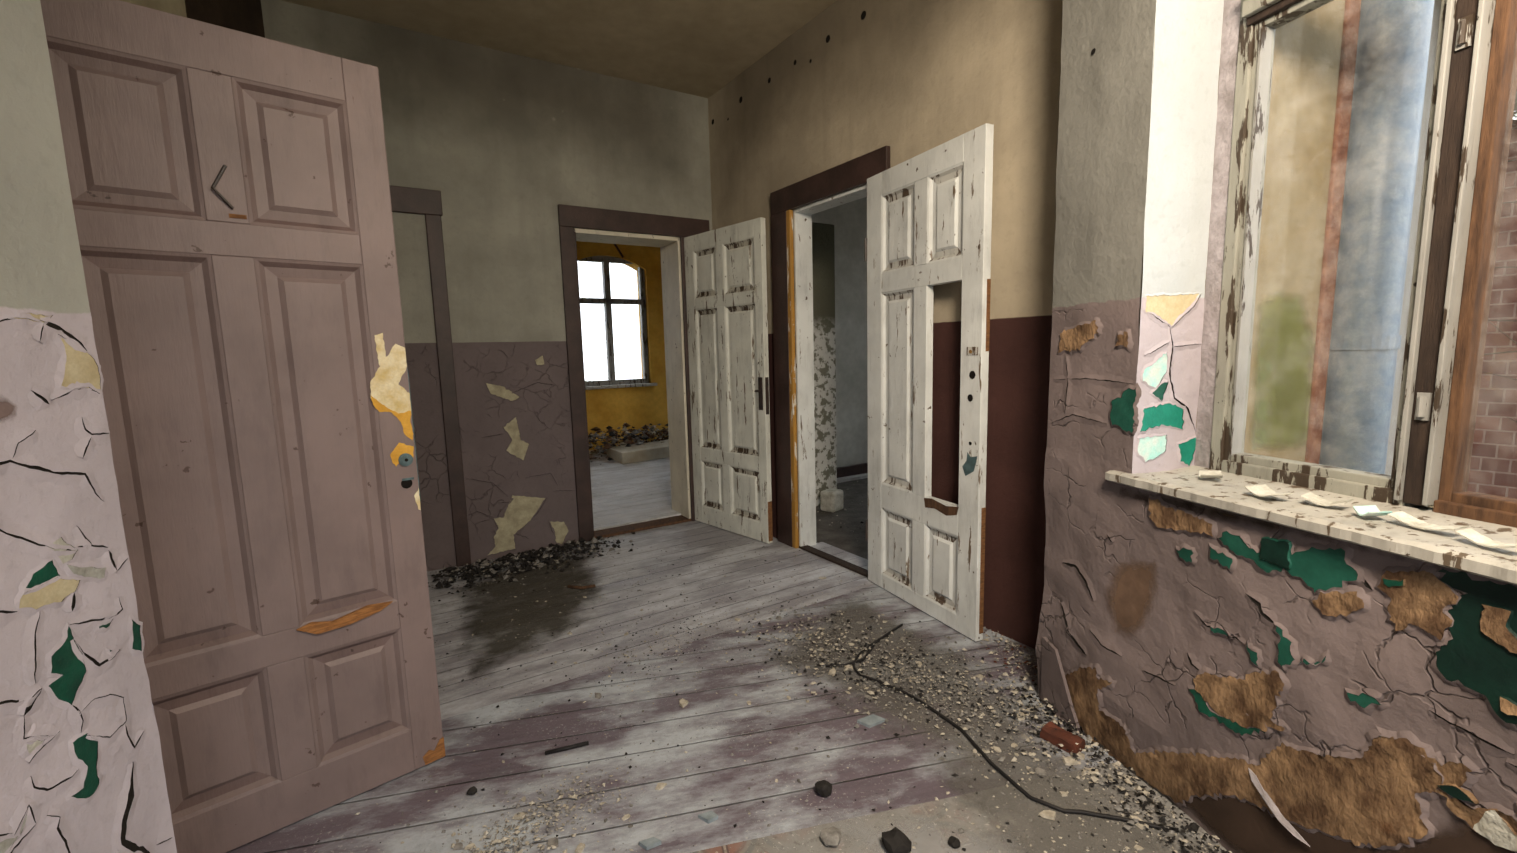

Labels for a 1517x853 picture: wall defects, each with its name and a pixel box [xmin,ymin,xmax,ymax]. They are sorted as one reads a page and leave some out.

peeling [1142,292,1203,329]
peeling [370,333,414,466]
peeling [1108,351,1223,478]
peeling [14,558,108,710]
crack [0,306,173,853]
peeling [94,613,144,656]
crack [1059,532,1278,690]
peeling [1147,495,1517,732]
peeling [1244,484,1517,548]
peeling [64,728,102,806]
flaking render [1041,622,1517,853]
crack [1427,706,1517,775]